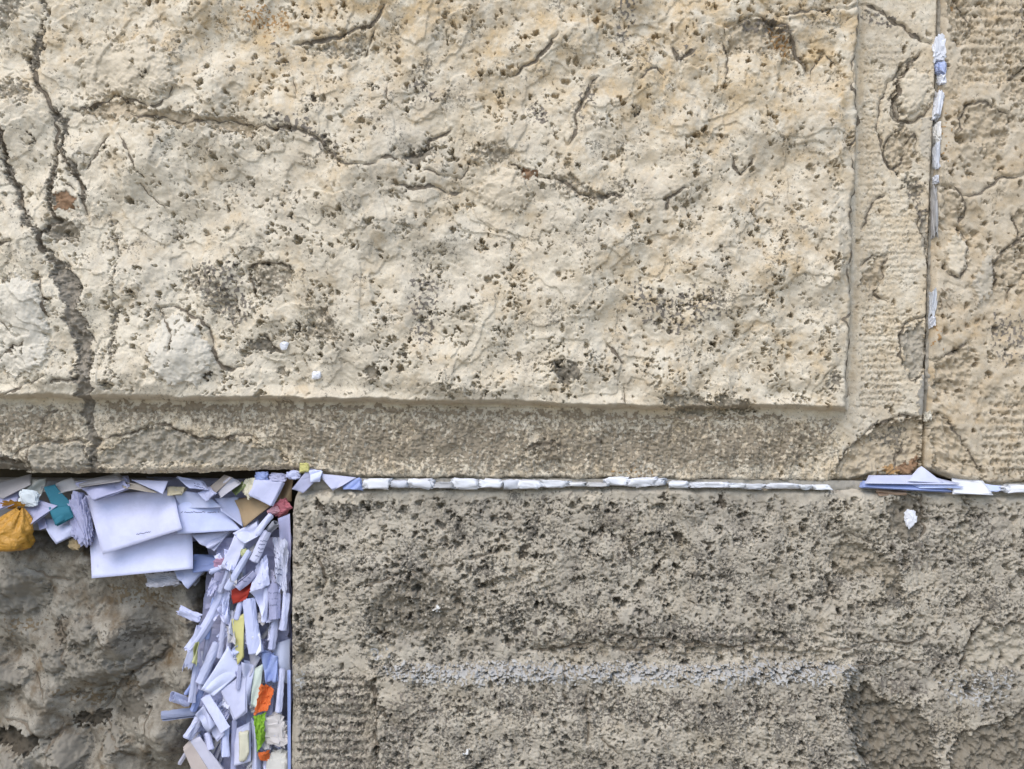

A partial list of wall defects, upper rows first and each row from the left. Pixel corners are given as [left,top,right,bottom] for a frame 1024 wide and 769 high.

crack [0,0,469,473]
crack [511,163,623,199]